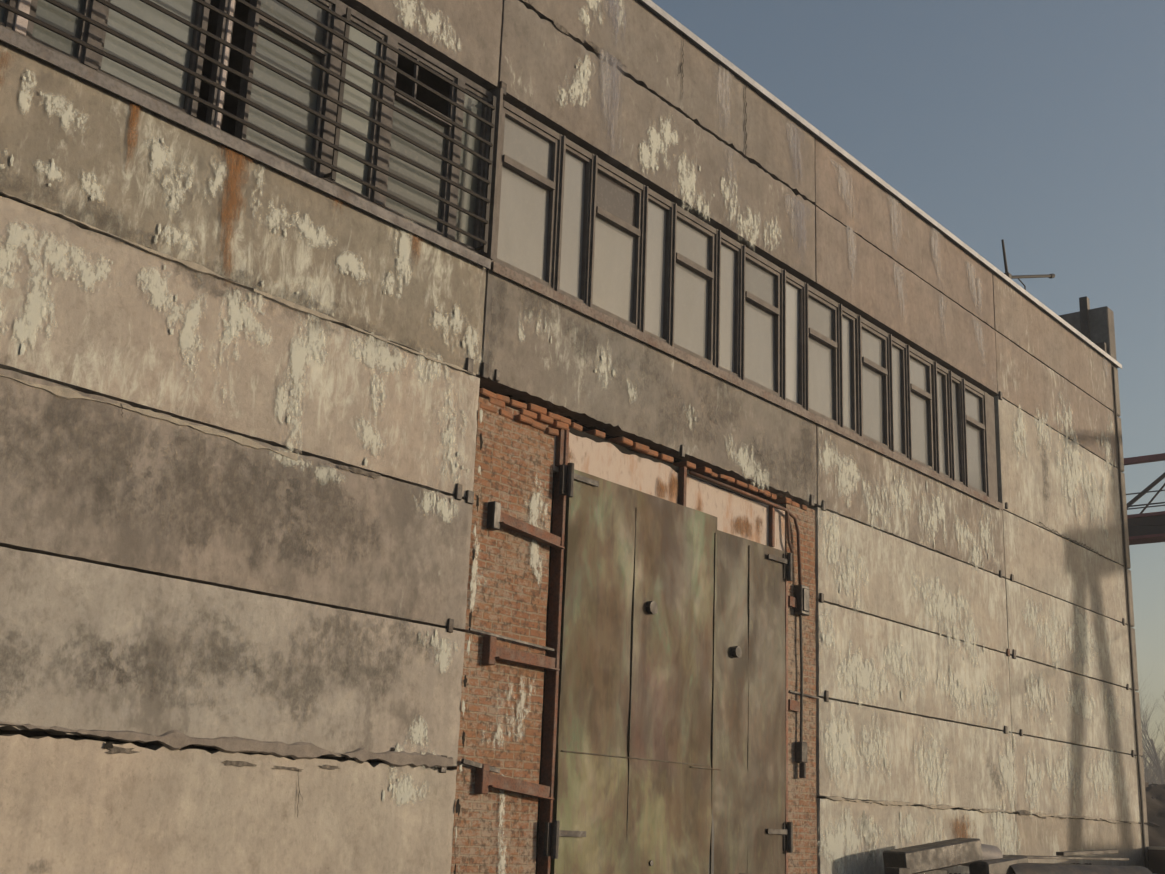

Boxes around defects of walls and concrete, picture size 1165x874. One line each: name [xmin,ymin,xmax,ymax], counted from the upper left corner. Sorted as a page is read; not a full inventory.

peeling [19,70,85,128]
peeling [0,224,113,356]
corrosion [221,144,251,270]
peeling [383,229,418,297]
peeling [395,0,460,49]
peeling [558,0,627,106]
peeling [640,118,781,248]
crack [742,84,750,159]
peeling [274,291,481,485]
spalling [479,388,807,511]
corrosion [733,517,762,537]
peeling [819,430,994,567]